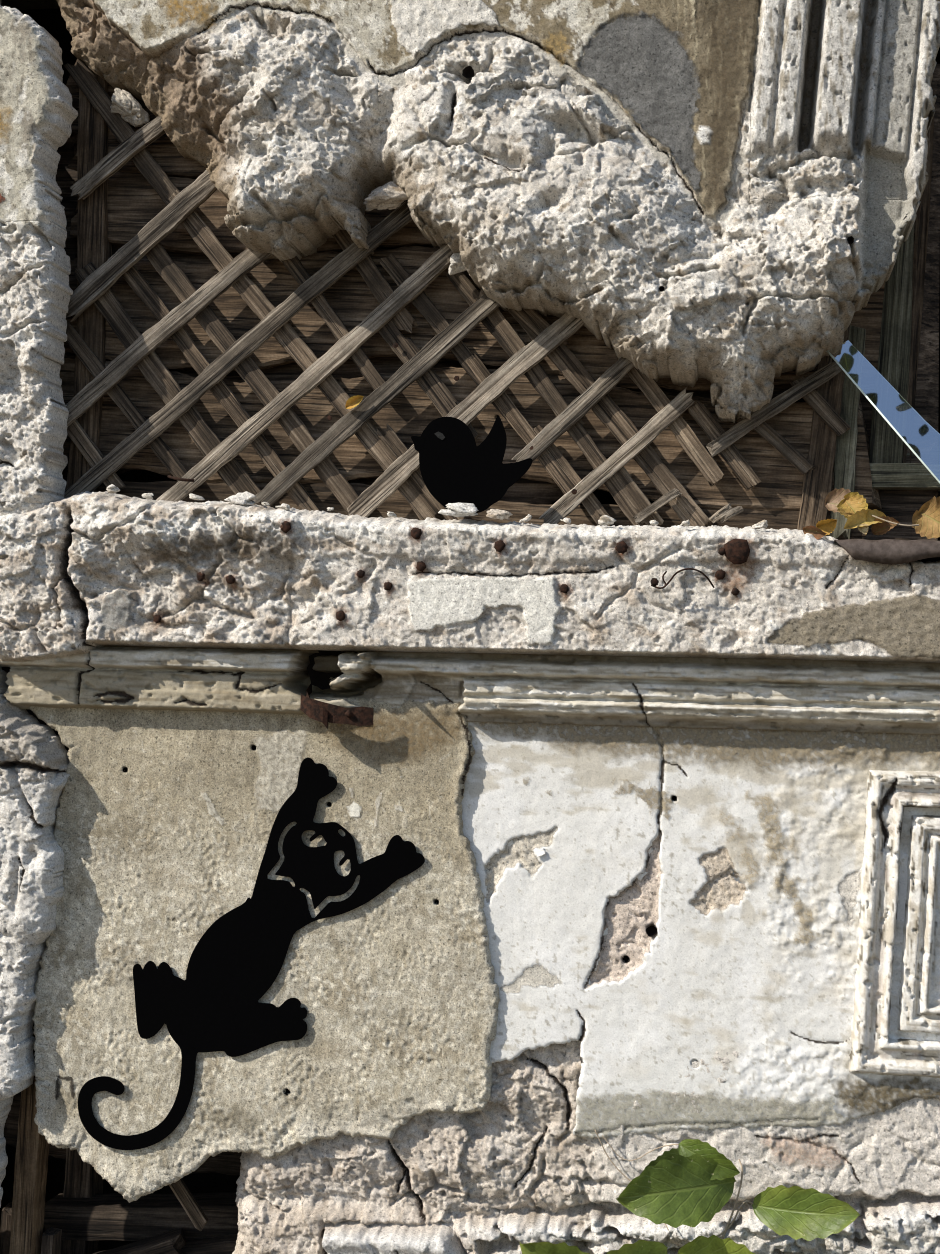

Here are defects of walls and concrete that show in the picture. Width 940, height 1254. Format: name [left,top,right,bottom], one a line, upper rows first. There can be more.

spalling [485,827,558,901]
spalling [586,833,661,988]
crack [514,683,860,1187]
spalling [690,848,746,915]
crack [388,1141,426,1221]